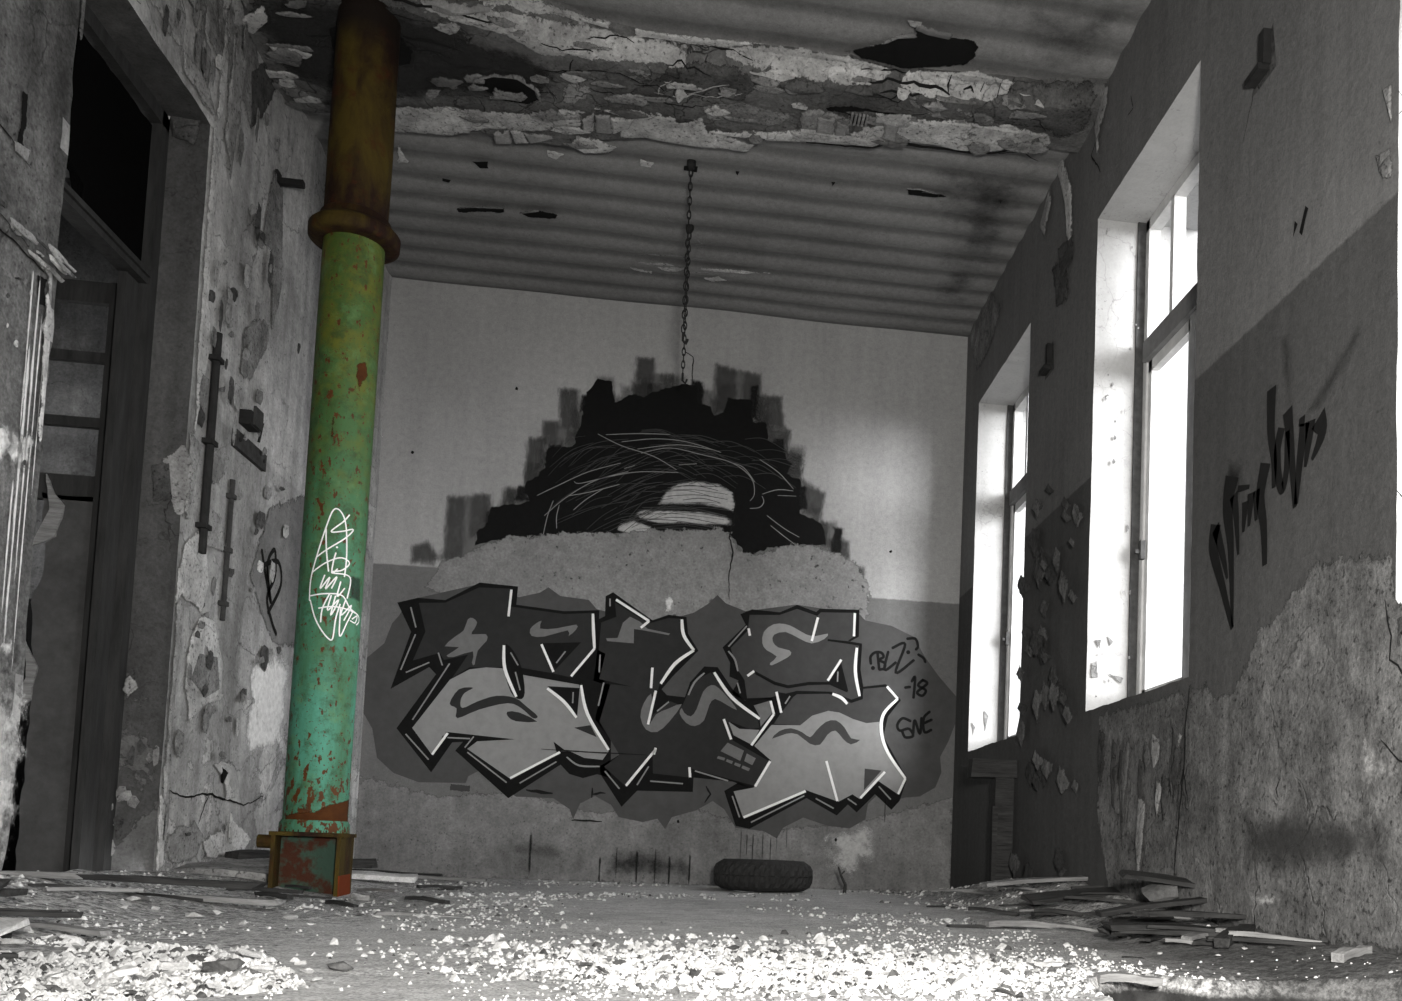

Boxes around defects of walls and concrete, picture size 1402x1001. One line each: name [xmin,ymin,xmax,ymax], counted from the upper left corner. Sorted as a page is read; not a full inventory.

flaking render [386,0,1108,307]
peeling [6,264,53,441]
flaking render [128,0,342,871]
peeling [366,501,376,559]
peeling [424,525,872,620]
peeling [123,669,138,696]
peeling [1016,484,1084,796]
crack [1385,601,1402,674]
peeling [1091,551,1402,955]
peeling [111,786,140,856]
corrosion [285,800,349,822]
corrosion [337,874,350,897]